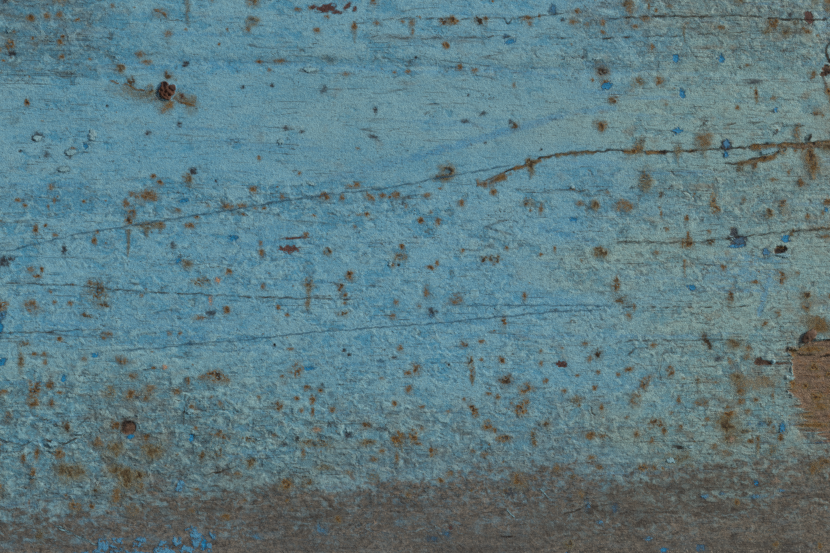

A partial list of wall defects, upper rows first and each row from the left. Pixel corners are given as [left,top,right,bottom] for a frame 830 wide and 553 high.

rust [112,64,196,111]
spalling [820,43,830,96]
crack [477,125,830,187]
rust [340,183,399,201]
rust [419,166,455,197]
rust [174,370,229,394]
rust [510,382,534,414]
peeling [755,329,830,443]
rust [471,419,510,455]